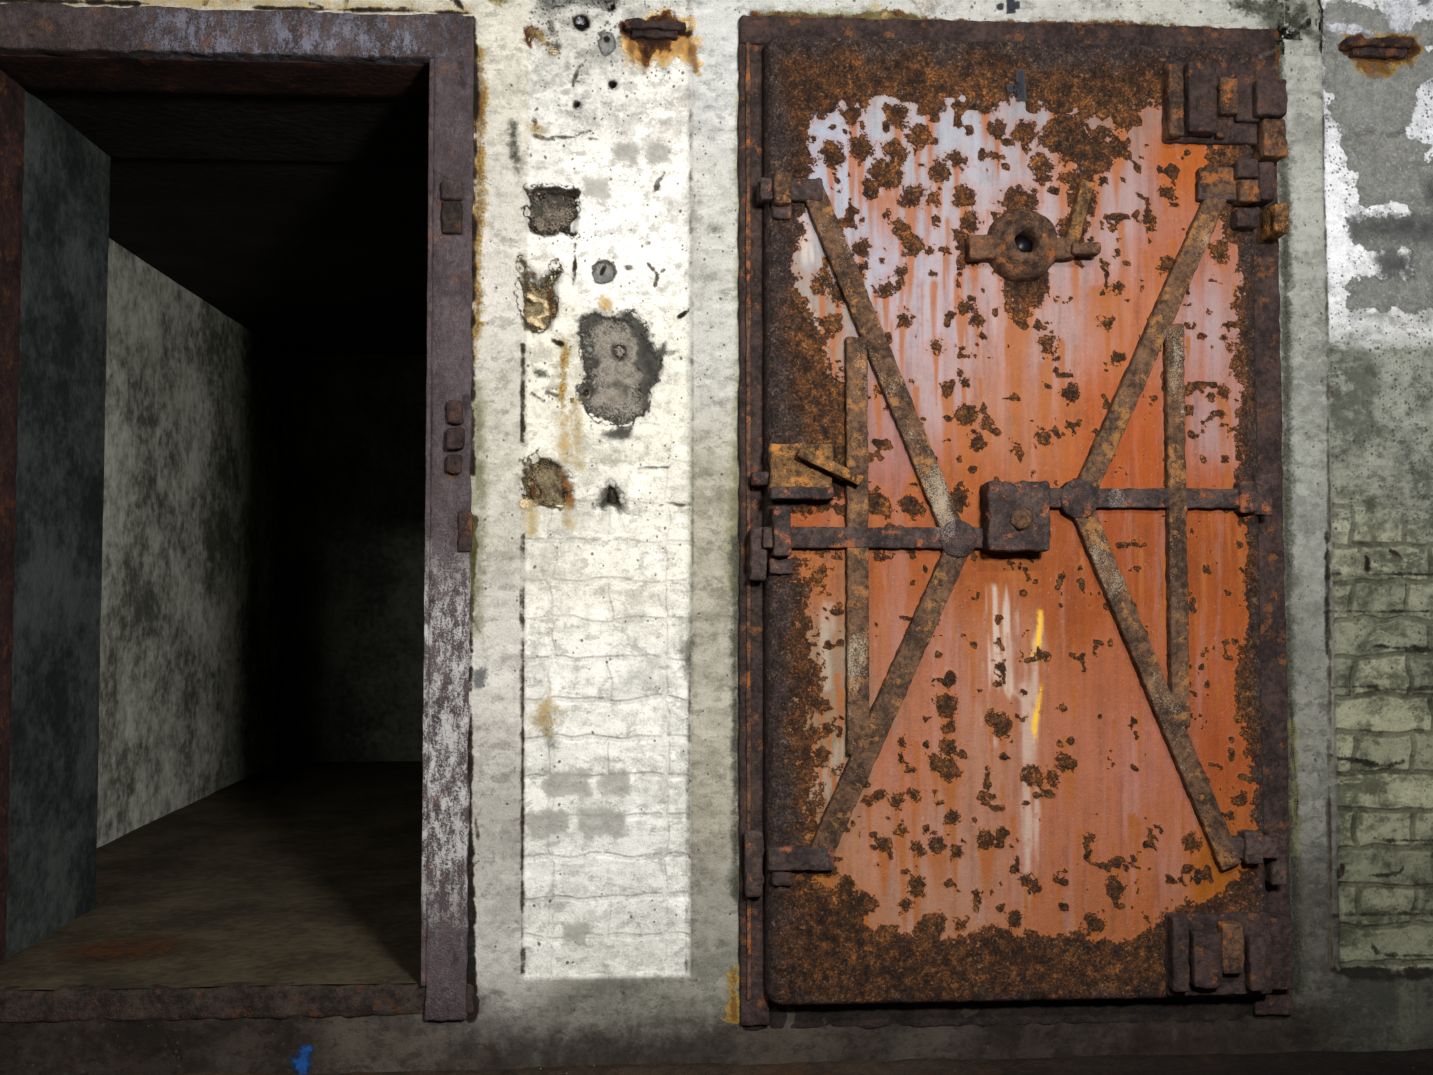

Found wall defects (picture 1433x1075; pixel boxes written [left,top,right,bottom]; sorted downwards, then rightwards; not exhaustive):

spalling [523,0,620,55]
corrosion [618,8,704,77]
corrosion [750,3,973,21]
corrosion [996,19,1176,27]
corrosion [1338,31,1424,78]
peeling [1321,0,1433,317]
spalling [513,142,669,334]
spalling [519,449,575,536]